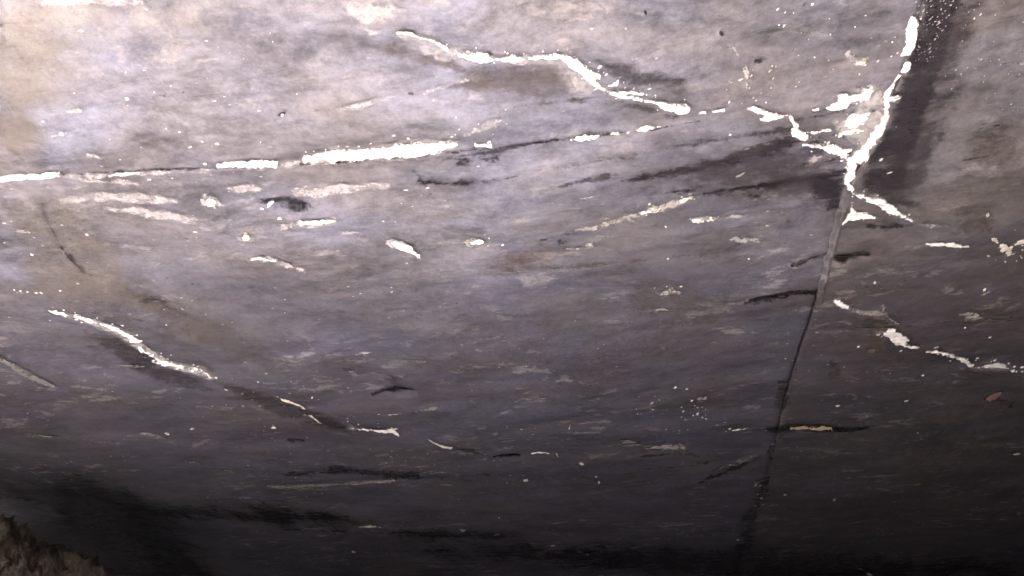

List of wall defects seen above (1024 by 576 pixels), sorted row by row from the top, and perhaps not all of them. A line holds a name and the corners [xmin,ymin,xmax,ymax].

crack [0,16,969,248]
damp [863,0,978,208]
peeling [386,239,420,258]
crack [48,309,228,391]
crack [833,300,1024,376]
crack [257,381,321,424]
crack [347,421,400,436]